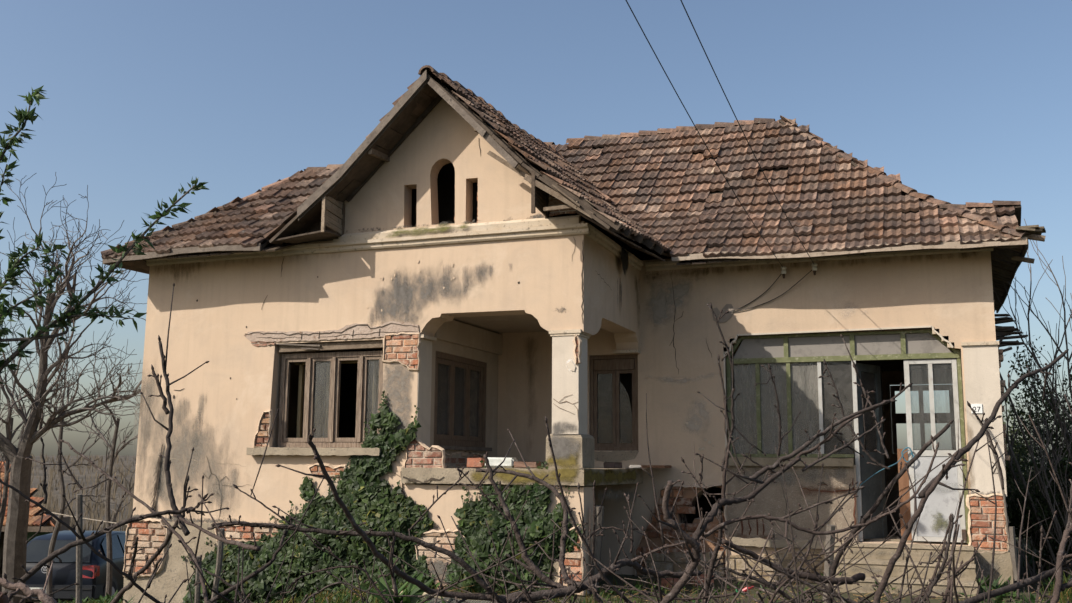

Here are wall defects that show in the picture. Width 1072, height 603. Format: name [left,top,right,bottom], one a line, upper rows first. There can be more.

leakage [367,259,491,322]
flaking render [382,332,421,371]
leakage [135,383,235,501]
flaking render [253,410,273,448]
flaking render [404,437,486,468]
flaking render [966,345,1010,554]
flaking render [123,518,169,578]
flaking render [634,484,825,582]